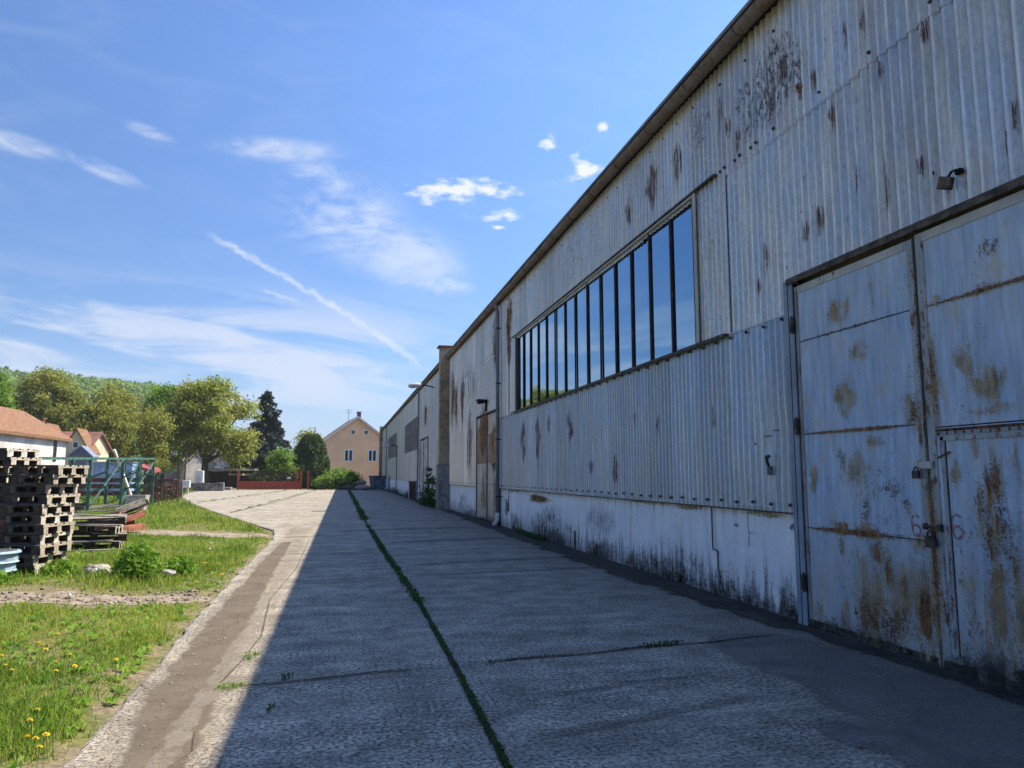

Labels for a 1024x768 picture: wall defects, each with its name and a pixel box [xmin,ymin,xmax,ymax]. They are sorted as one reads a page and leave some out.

rust [645,161,659,205]
rust [450,370,496,522]
rust [799,261,1024,668]
damp [587,538,798,620]